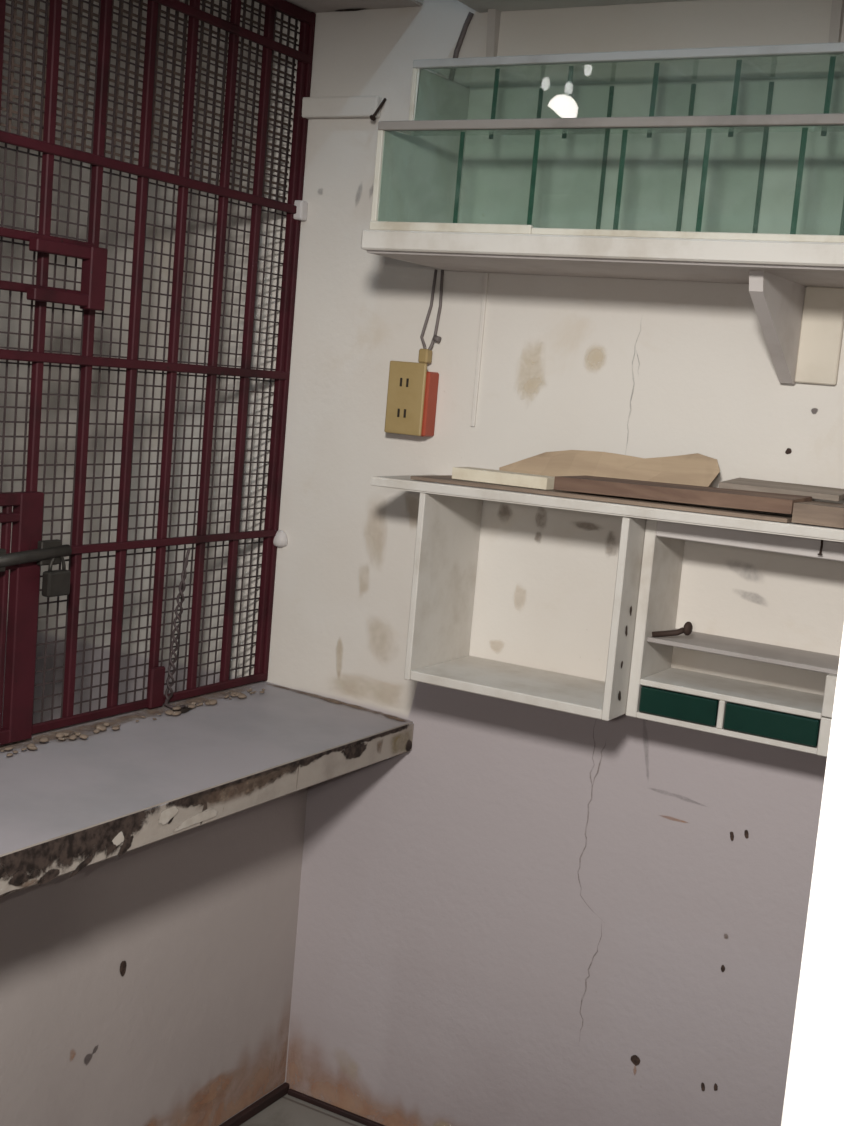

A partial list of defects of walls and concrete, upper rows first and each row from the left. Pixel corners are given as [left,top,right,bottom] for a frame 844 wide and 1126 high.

spalling [0,724,409,898]
water stain [177,1050,418,1126]